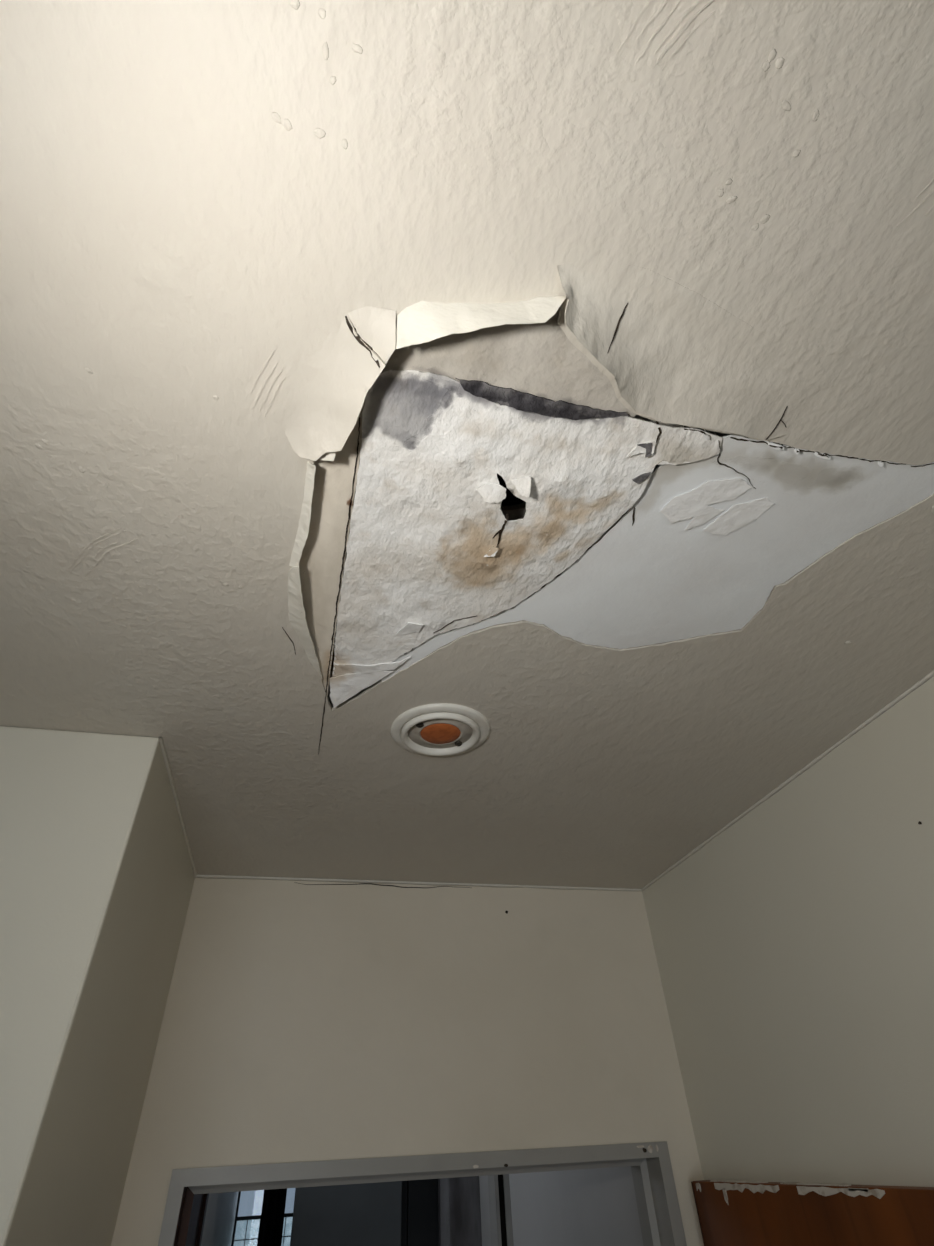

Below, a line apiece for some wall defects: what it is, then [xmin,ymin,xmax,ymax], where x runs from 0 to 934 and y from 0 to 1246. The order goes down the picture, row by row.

crack [318,417,360,754]
spalling [288,295,934,708]
peeling [696,1183,779,1204]
peeling [796,1186,885,1199]